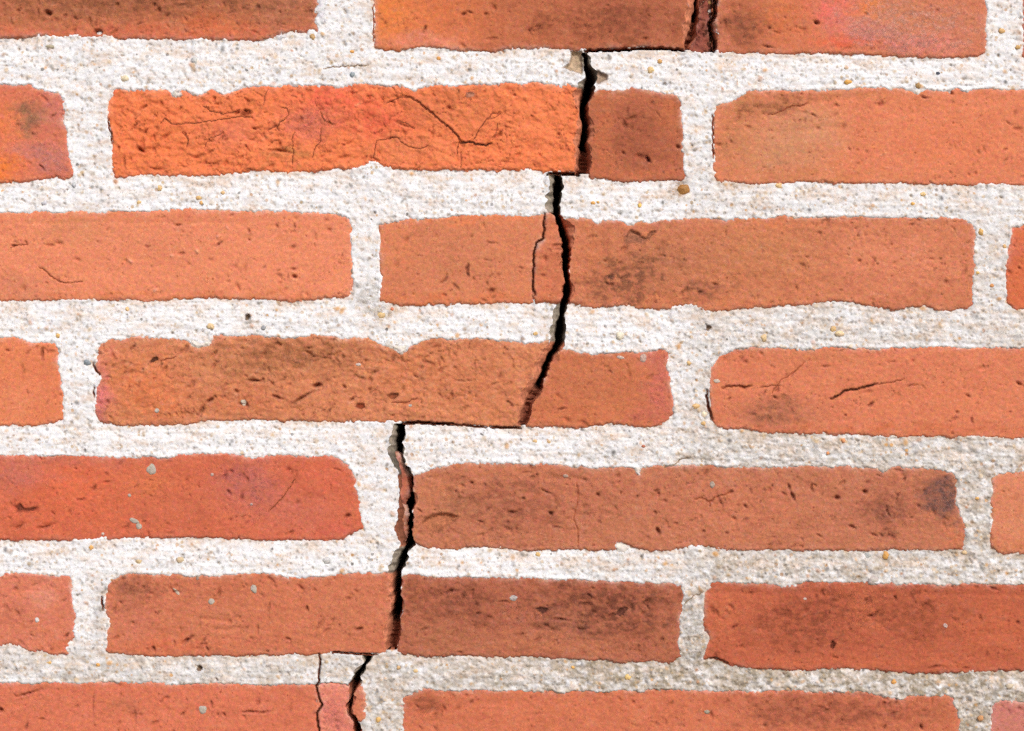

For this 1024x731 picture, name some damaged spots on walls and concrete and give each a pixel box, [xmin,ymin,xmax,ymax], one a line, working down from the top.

crack [315,0,718,731]